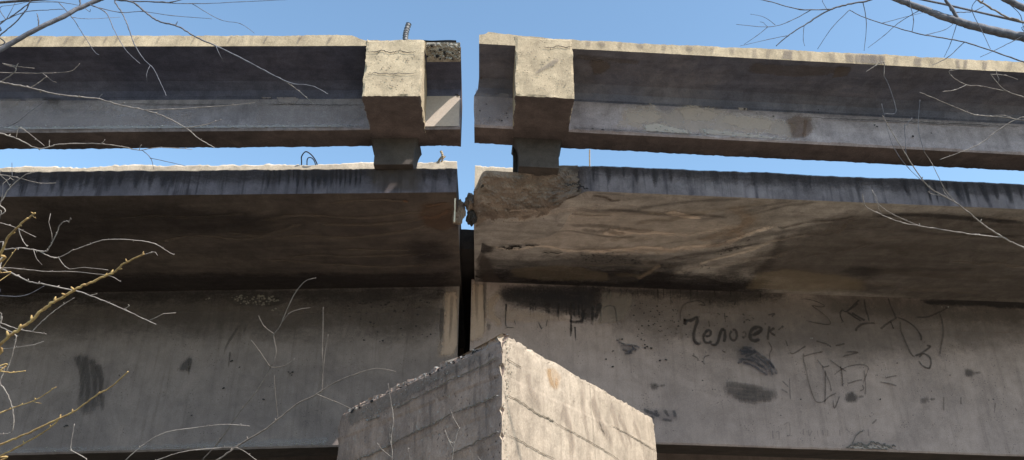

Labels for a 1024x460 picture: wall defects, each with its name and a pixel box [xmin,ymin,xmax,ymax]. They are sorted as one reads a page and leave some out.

spalling [404,42,460,62]
leakage [0,168,454,187]
spalling [474,149,590,227]
leakage [470,166,1024,341]
spalling [344,334,512,460]